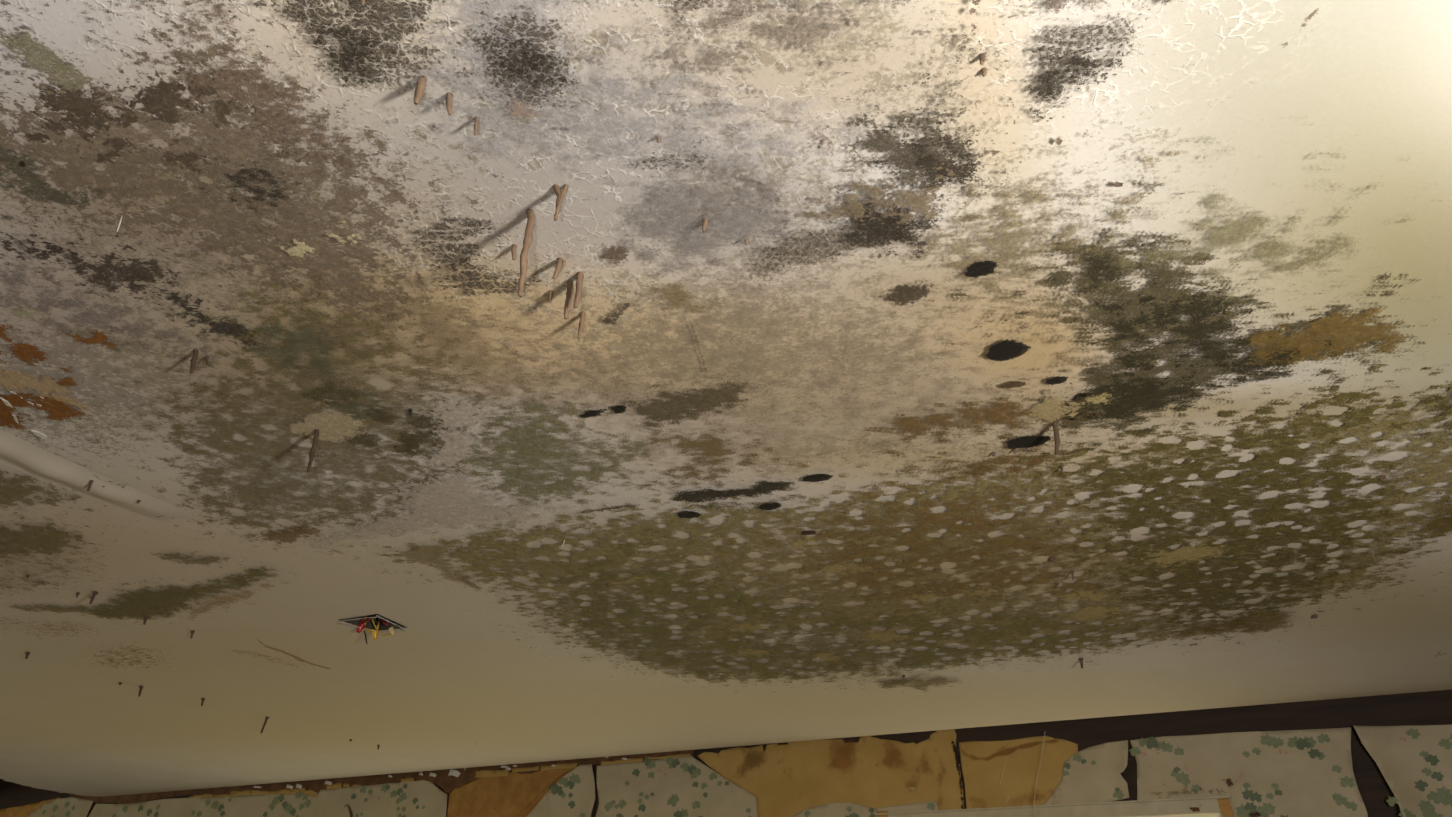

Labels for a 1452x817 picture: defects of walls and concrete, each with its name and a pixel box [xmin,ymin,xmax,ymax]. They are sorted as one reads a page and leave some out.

water stain [878,278,941,309]
peeling [0,364,103,420]
water stain [0,470,287,669]